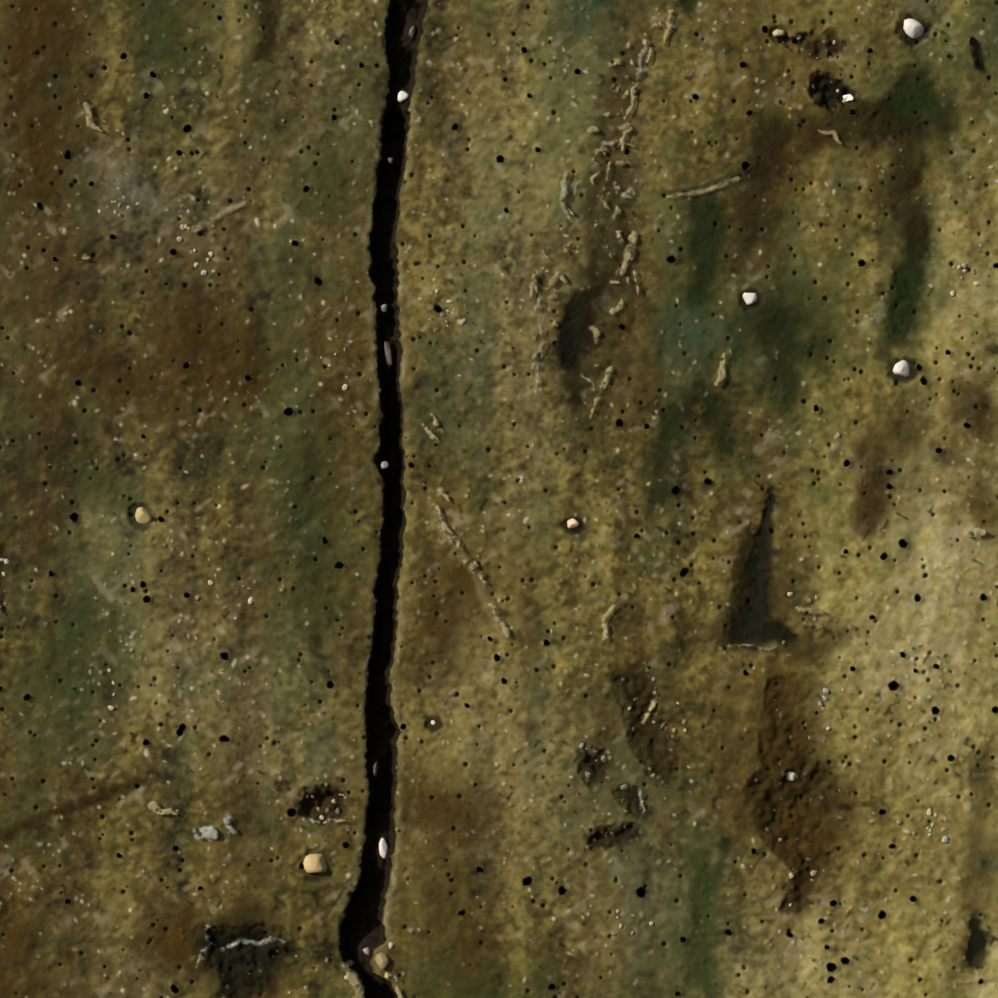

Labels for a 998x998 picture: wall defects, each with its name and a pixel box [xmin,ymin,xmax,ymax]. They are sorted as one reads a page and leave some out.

water stain [554,255,604,406]
crack [339,0,427,998]
water stain [724,487,796,649]